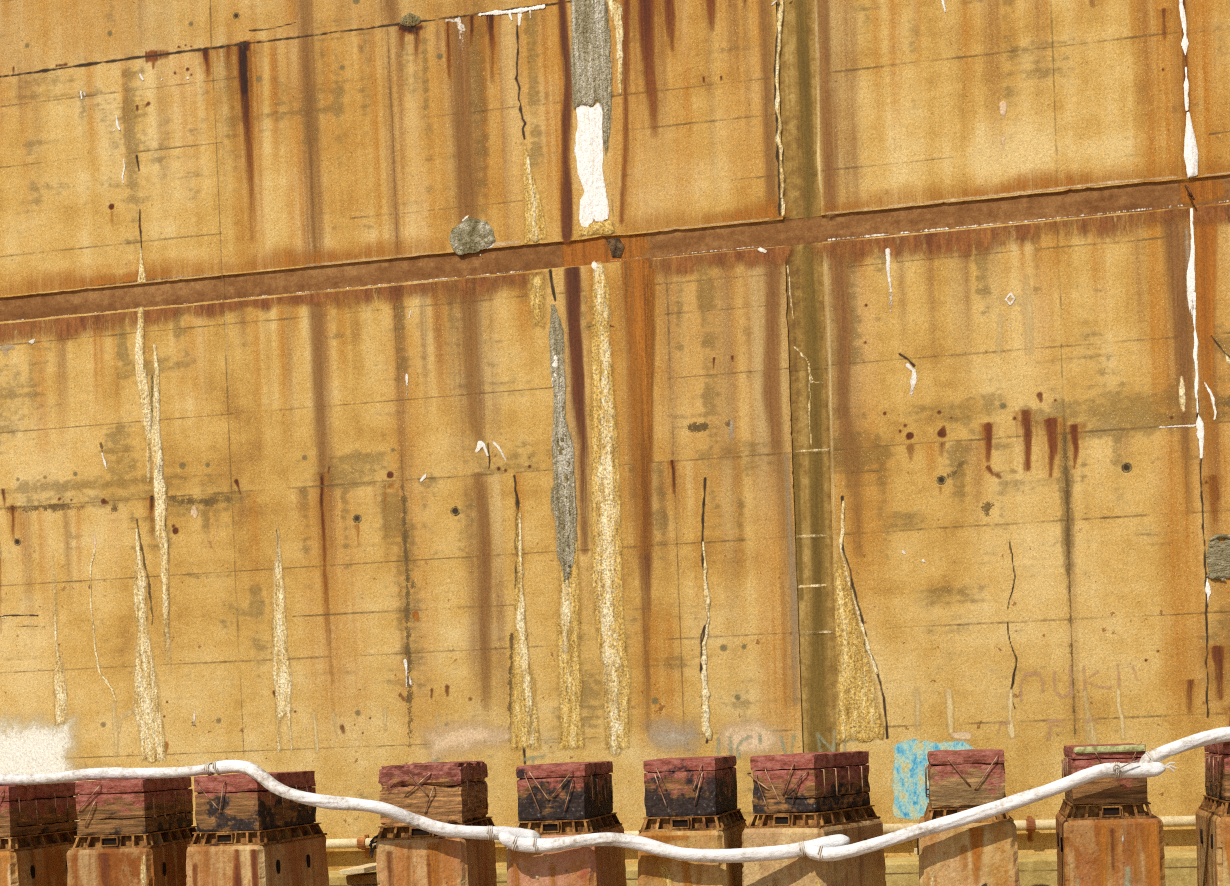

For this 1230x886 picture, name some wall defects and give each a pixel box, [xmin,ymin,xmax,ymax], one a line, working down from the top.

corrosion [469,14,496,67]
corrosion [558,0,791,616]
crack [787,266,819,444]
corrosion [982,422,1001,478]
corrosion [1013,410,1082,477]
crack [700,477,712,744]